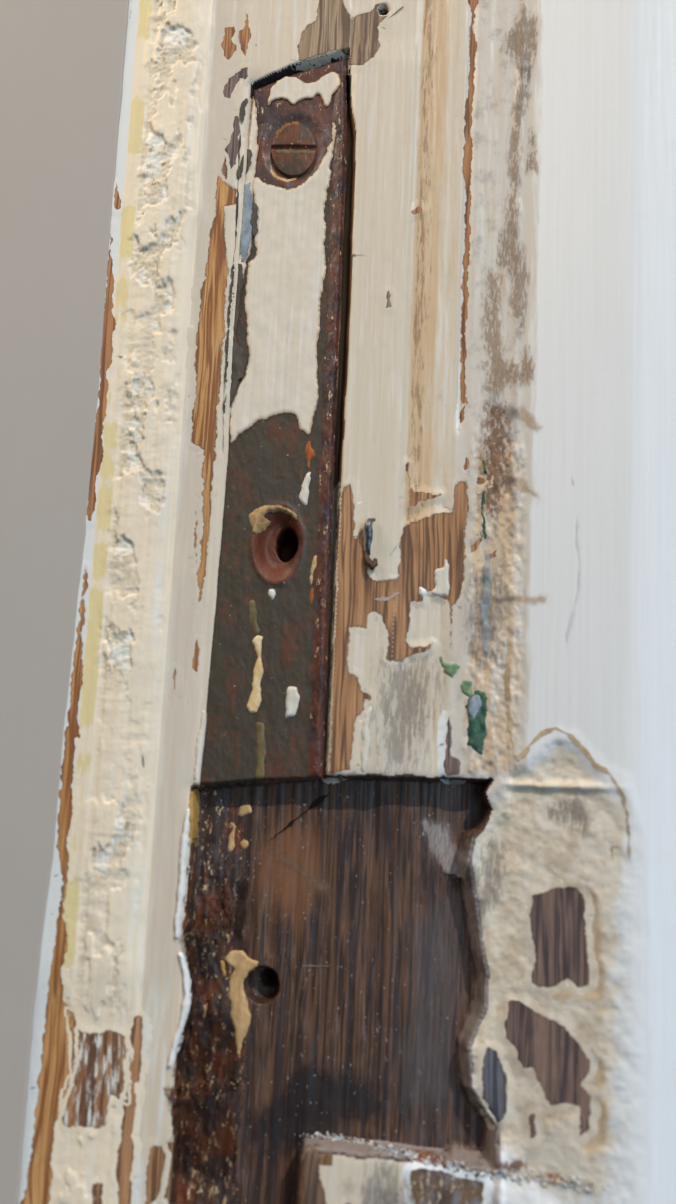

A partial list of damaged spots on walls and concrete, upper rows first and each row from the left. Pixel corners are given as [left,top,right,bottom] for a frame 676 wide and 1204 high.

peeling [128,0,140,25]
peeling [290,0,396,75]
peeling [86,178,129,530]
peeling [183,4,259,611]
peeling [455,0,479,431]
peeling [165,633,207,698]
peeling [322,449,494,785]
peeling [19,559,171,1204]
peeling [472,878,602,1149]
peeling [300,1144,326,1204]
peeling [402,1159,494,1204]